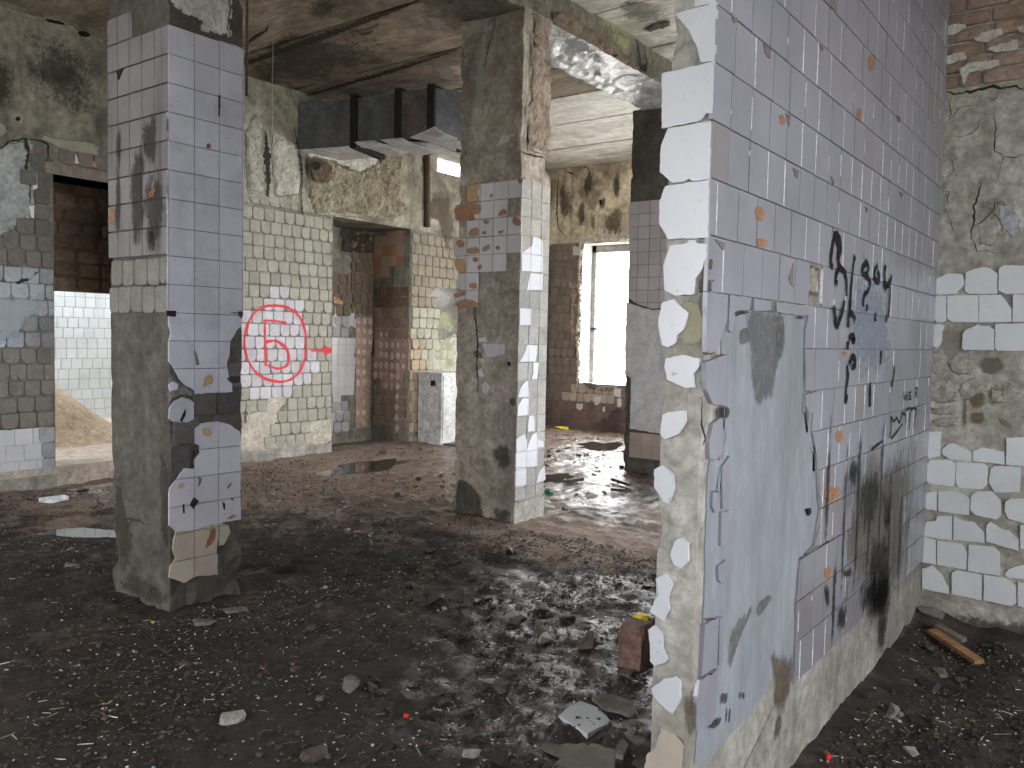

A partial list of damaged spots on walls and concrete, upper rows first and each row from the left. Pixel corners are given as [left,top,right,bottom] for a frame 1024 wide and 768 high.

spalling [643,20,670,32]
peeling [0,138,35,238]
leakage [115,117,165,252]
crack [942,83,1024,253]
spalling [699,259,714,293]
peeling [167,374,192,403]
crack [472,307,480,392]
spalling [182,477,202,513]
leakage [825,431,903,648]